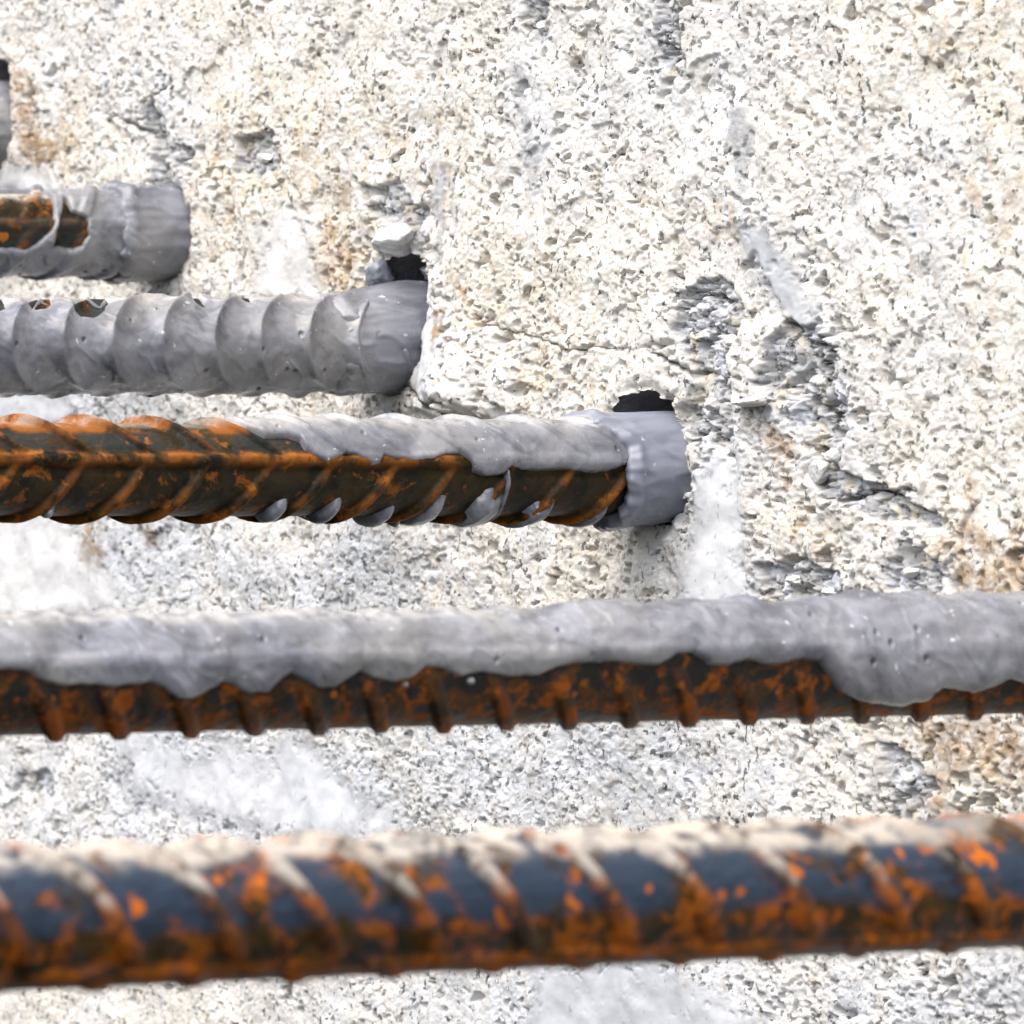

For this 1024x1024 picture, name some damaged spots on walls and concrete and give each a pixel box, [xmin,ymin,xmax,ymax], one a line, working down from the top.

spalling [362,184,433,258]
crack [479,318,716,376]
spalling [676,278,948,531]